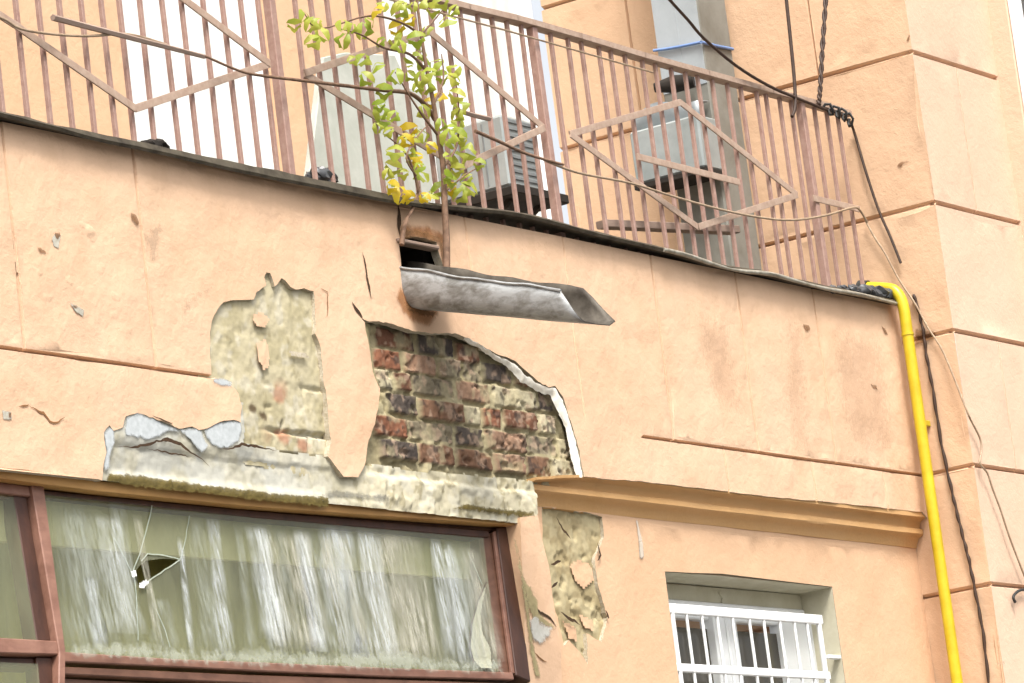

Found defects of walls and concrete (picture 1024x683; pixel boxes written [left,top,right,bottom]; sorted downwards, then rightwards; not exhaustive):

crack [321,252,371,318]
crack [19,404,65,424]
flaking render [365,322,582,486]
flaking render [516,508,609,677]